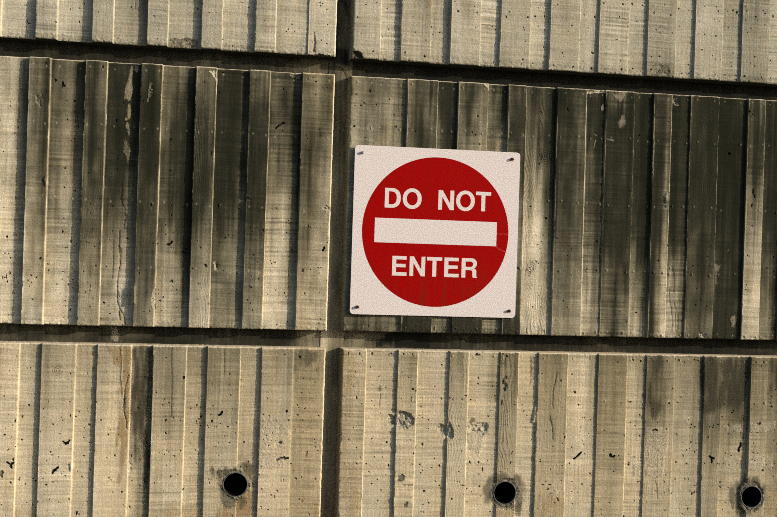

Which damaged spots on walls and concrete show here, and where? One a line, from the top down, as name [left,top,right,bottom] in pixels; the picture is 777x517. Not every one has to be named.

water stain [125,66,139,129]
crack [113,184,126,323]
water stain [700,358,748,411]
water stain [133,348,151,483]
spalling [386,410,414,430]
spalling [436,422,454,440]
spalling [467,422,489,437]
water stain [212,464,252,507]